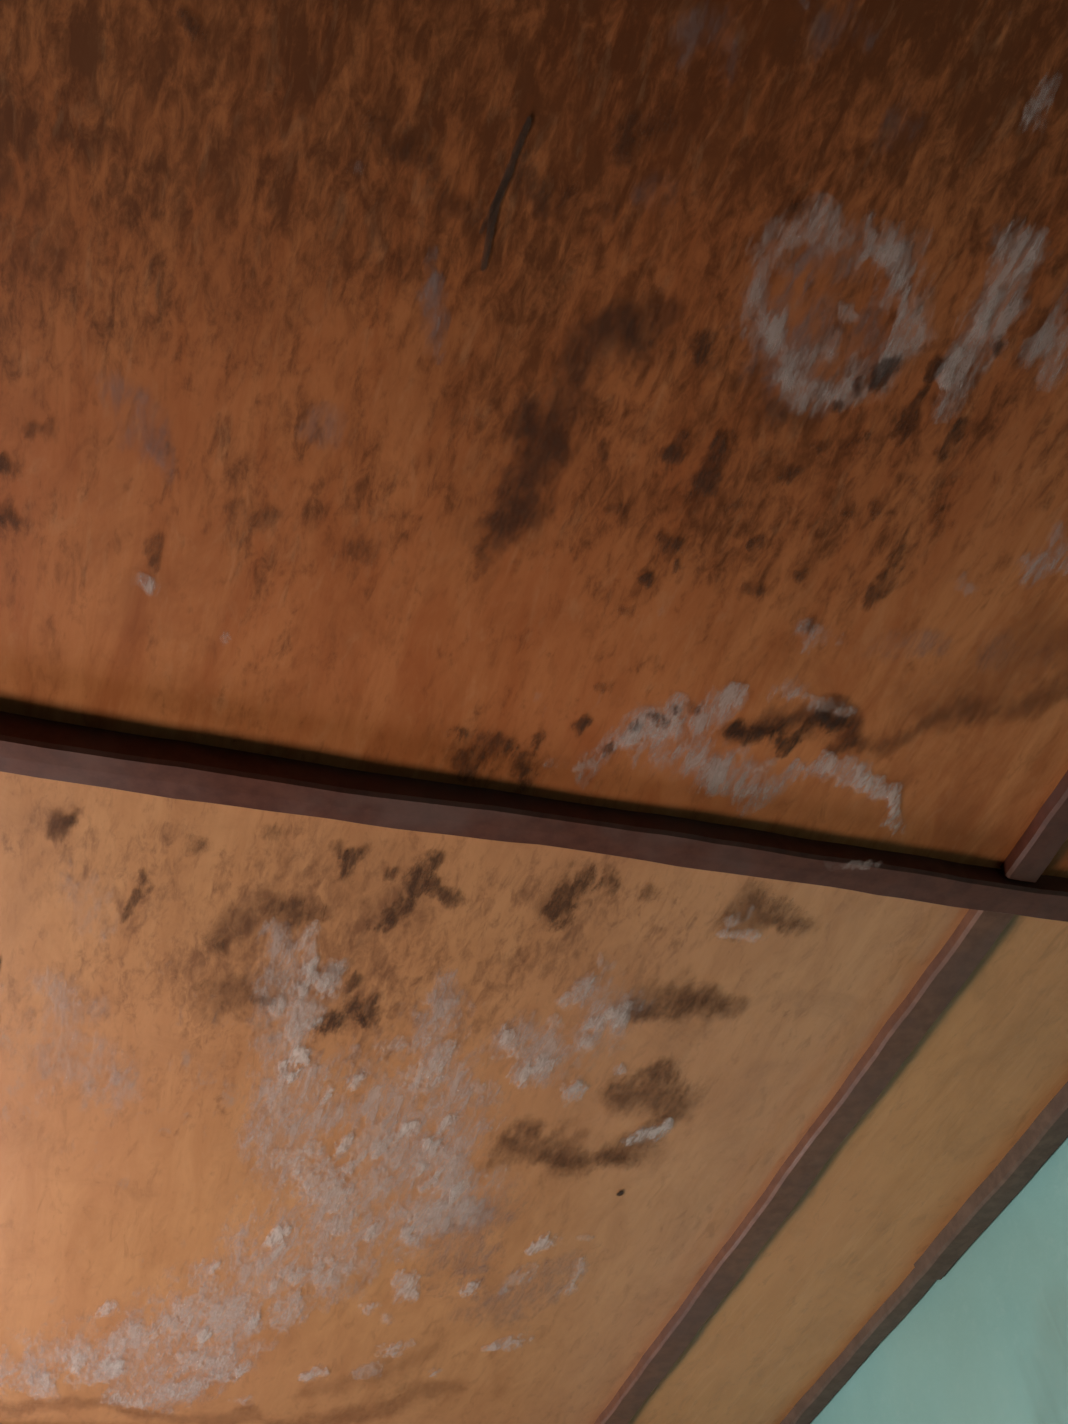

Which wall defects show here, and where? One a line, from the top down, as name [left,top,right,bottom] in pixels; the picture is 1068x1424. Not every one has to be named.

water stain [602,685,858,805]
water stain [25,959,486,1408]